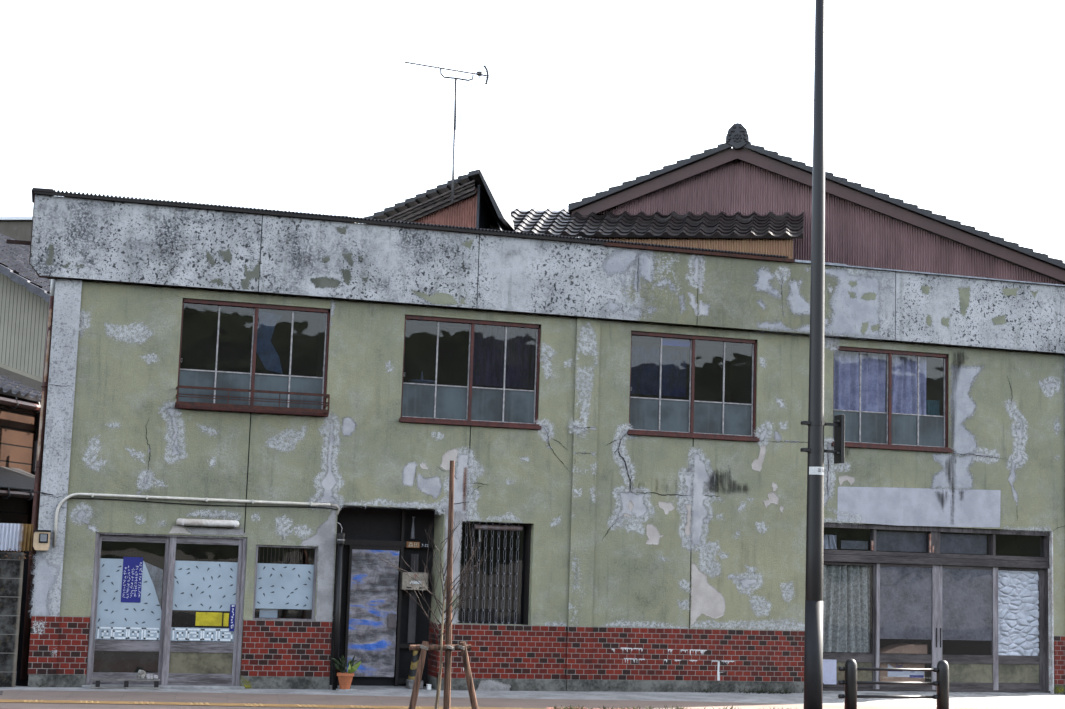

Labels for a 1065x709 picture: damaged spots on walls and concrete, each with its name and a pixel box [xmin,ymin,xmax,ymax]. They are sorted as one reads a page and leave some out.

peeling [104,322,160,364]
peeling [535,323,599,449]
peeling [599,248,710,318]
peeling [752,265,811,334]
peeling [824,266,883,352]
peeling [82,421,122,474]
peeling [125,401,220,495]
peeling [265,412,521,624]
crack [543,427,718,497]
peeling [601,422,805,631]
damp [709,473,747,492]
peeling [928,364,1029,505]